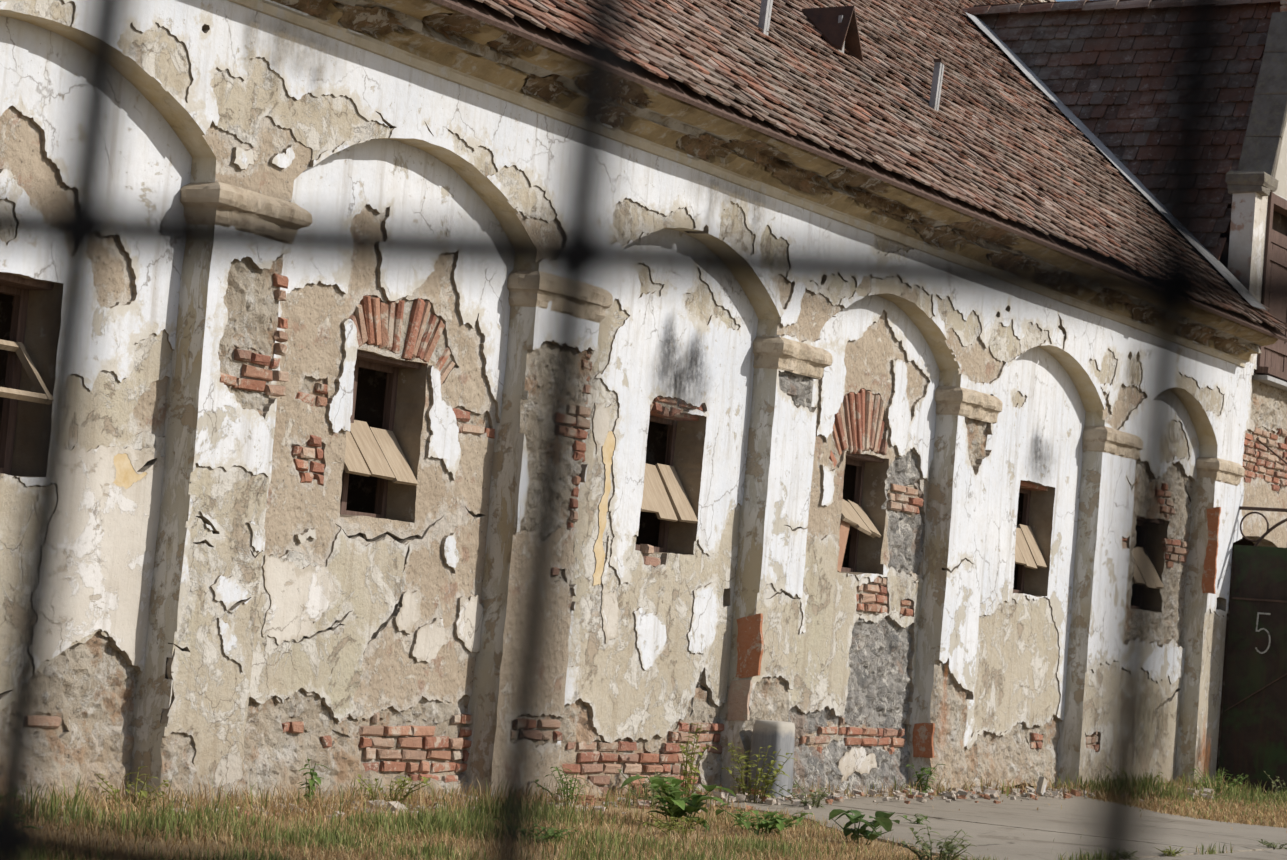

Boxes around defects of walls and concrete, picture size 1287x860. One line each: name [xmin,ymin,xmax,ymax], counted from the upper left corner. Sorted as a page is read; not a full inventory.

peeling [0,0,74,27]
flaking render [0,106,62,204]
flaking render [0,246,54,281]
leakage [666,324,675,359]
flaking render [1242,376,1287,521]
peeling [0,473,25,685]
peeling [35,330,172,804]
flaking render [160,260,497,803]
peeling [542,286,1060,797]
peeling [1165,445,1227,783]
peeling [1078,663,1107,788]
peeling [1151,677,1182,786]